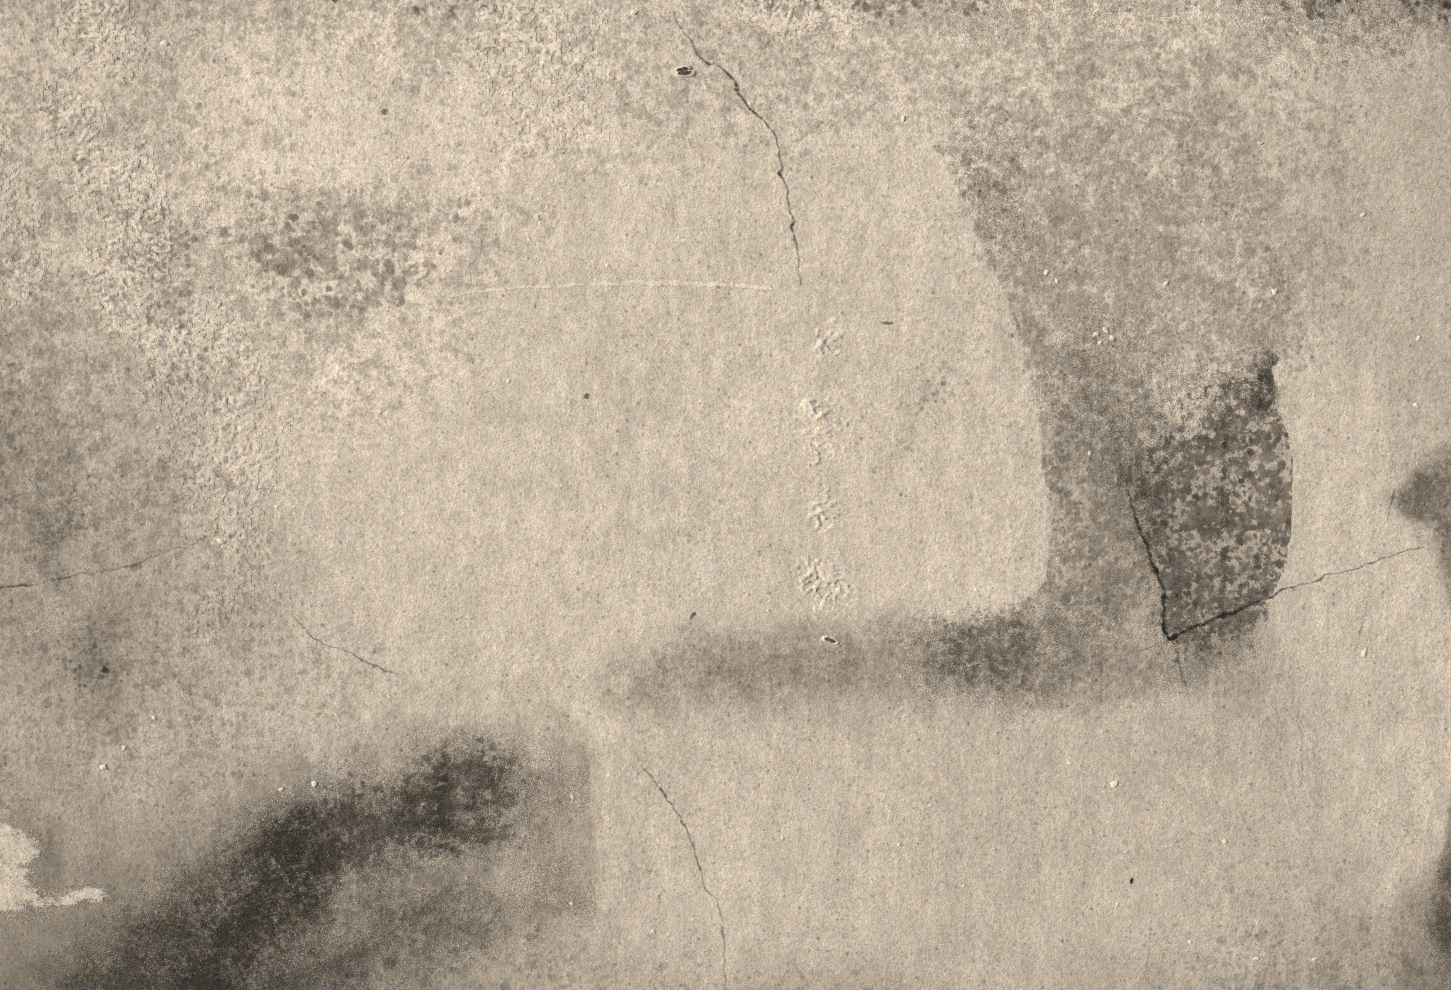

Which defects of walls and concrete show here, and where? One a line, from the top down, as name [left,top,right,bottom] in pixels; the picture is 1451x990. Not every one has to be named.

crack [679,26,801,283]
leakage [1120,359,1293,672]
crack [1126,489,1326,662]
leakage [1392,460,1451,567]
peeling [0,817,110,918]
leakage [68,761,498,990]